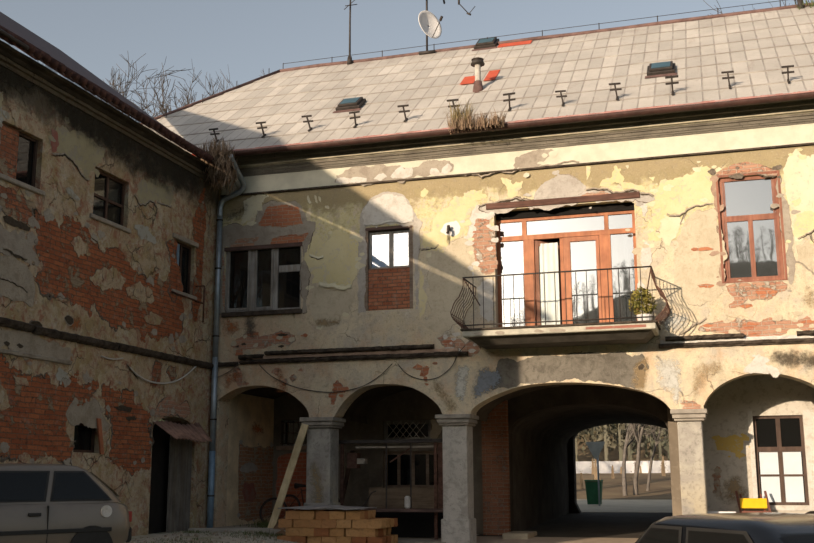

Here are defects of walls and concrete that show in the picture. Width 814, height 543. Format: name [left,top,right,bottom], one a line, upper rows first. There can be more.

peeling [48,117,106,180]
crack [52,153,89,181]
crack [586,187,654,197]
crack [667,203,713,225]
spalling [219,148,814,337]
crack [797,229,814,243]
flaking render [0,178,209,351]
flaking render [231,330,308,356]
flaking render [437,321,483,357]
leakage [775,352,814,367]
flaking render [0,353,191,476]
peeling [712,433,750,459]